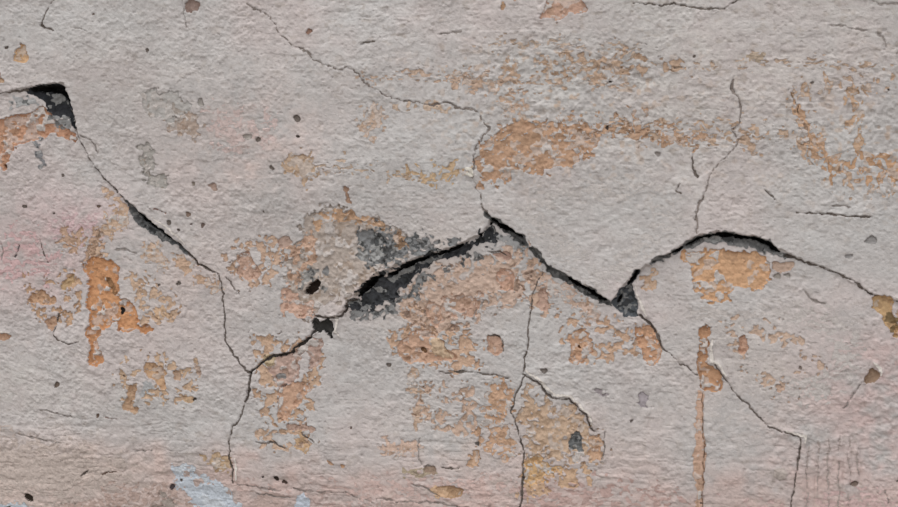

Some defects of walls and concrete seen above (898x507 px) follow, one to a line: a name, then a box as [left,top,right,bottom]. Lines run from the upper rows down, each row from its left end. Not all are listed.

crack [633,0,737,10]
spalling [0,95,78,171]
peeling [354,33,898,200]
spalling [22,186,226,367]
crack [0,83,458,507]
crack [246,3,877,507]
spalling [680,247,795,304]
spalling [112,349,202,415]
peeling [221,186,662,500]
spalling [696,325,726,392]
peeling [719,314,827,403]
spalling [864,362,883,384]